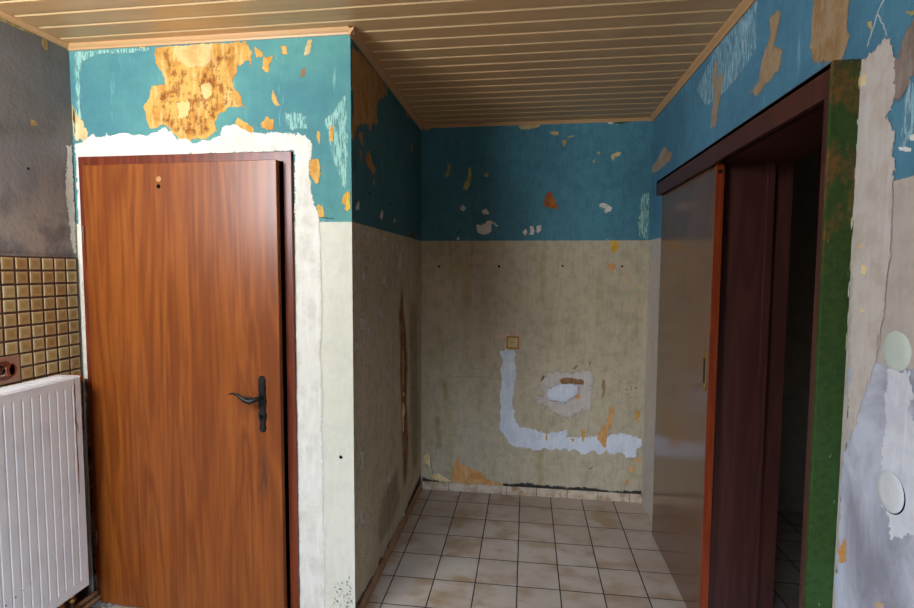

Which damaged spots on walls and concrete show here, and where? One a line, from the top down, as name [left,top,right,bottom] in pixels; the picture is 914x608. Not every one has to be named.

peeling [140,41,288,141]
peeling [351,46,388,184]
peeling [544,192,558,209]
spalling [536,369,595,418]
peeling [597,406,614,447]
peeling [424,453,501,486]
flaking render [834,361,914,608]